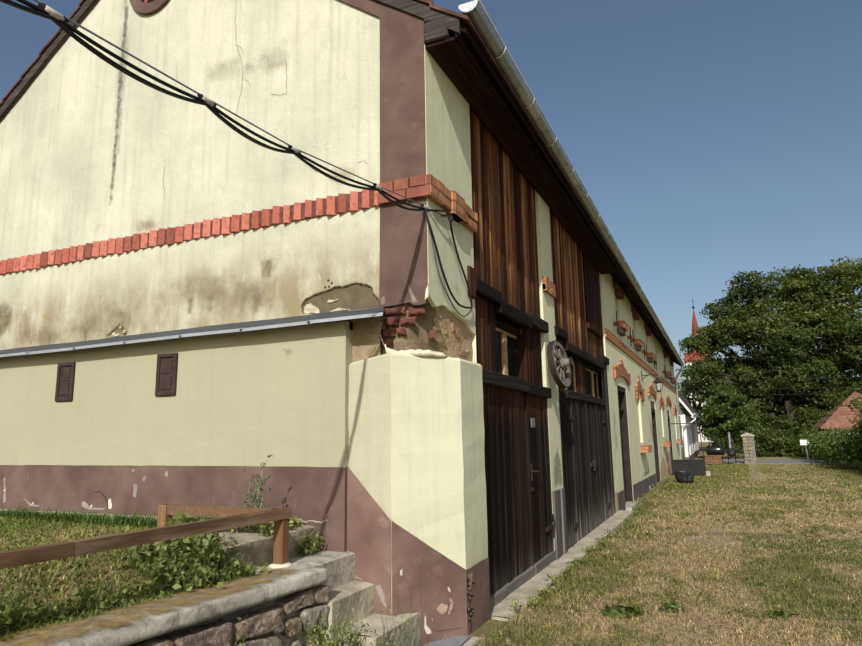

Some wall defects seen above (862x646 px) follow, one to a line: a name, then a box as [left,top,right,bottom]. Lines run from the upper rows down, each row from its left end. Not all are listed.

water stain [110,9,128,199]
water stain [0,307,11,333]
spalling [301,279,473,363]
peeling [424,587,455,634]
peeling [466,573,475,632]